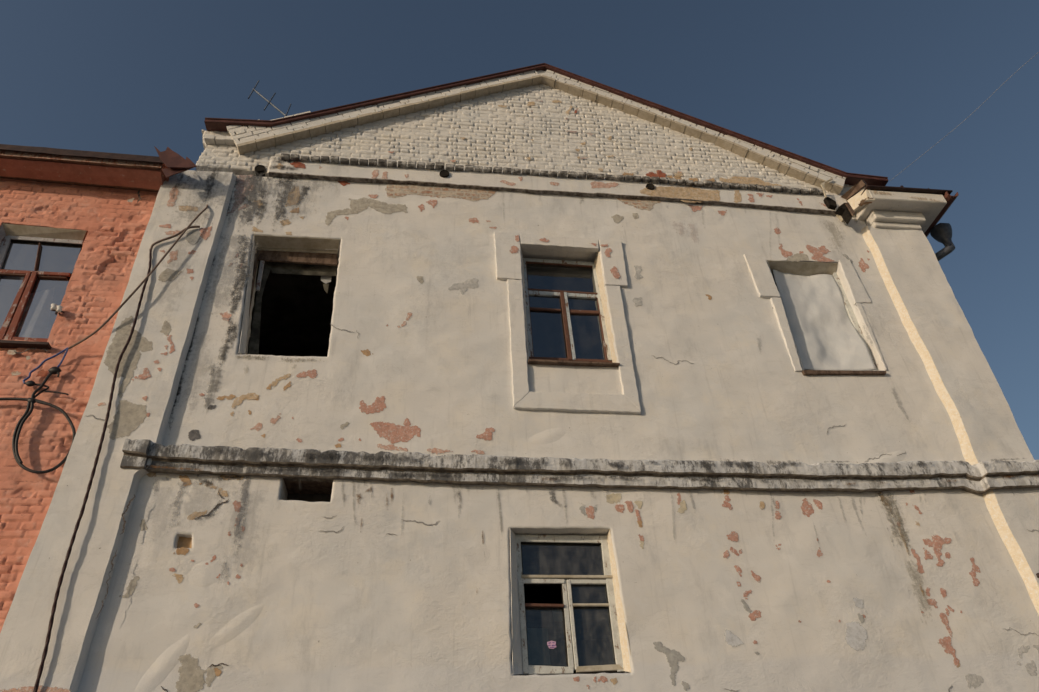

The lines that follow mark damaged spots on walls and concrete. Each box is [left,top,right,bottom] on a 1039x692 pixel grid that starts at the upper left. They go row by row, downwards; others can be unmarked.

flaking render [325,170,523,225]
peeling [98,316,175,440]
leakage [171,314,199,414]
leakage [188,430,200,441]
leakage [263,451,345,471]
peeling [359,396,421,451]
leakage [358,454,456,476]
leakage [688,459,750,480]
crack [195,491,229,520]
crack [97,495,135,617]
peeling [921,587,984,688]
spalling [176,654,222,692]